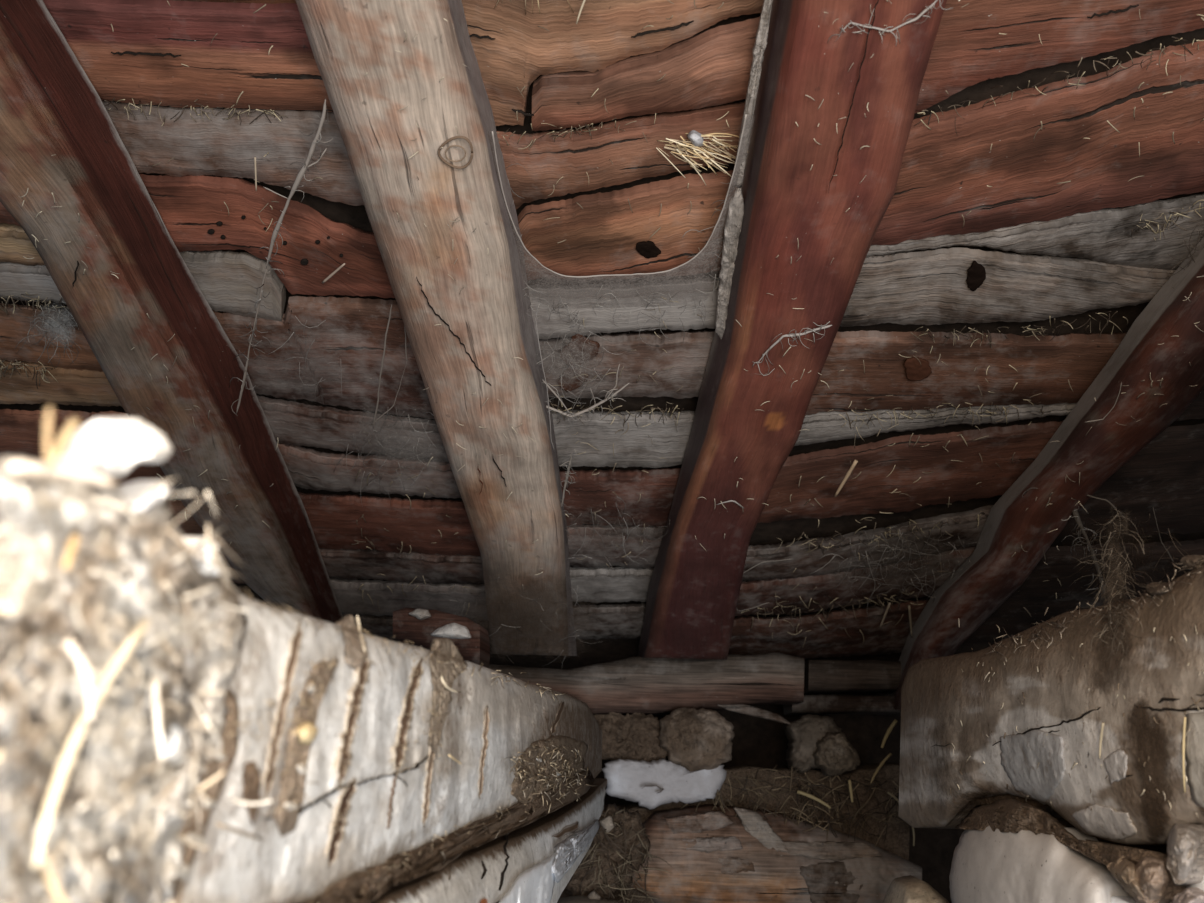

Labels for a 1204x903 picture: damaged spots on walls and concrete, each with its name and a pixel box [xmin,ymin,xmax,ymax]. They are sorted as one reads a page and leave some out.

crack [829,0,879,187]
crack [1134,694,1204,712]
crack [992,707,1101,746]